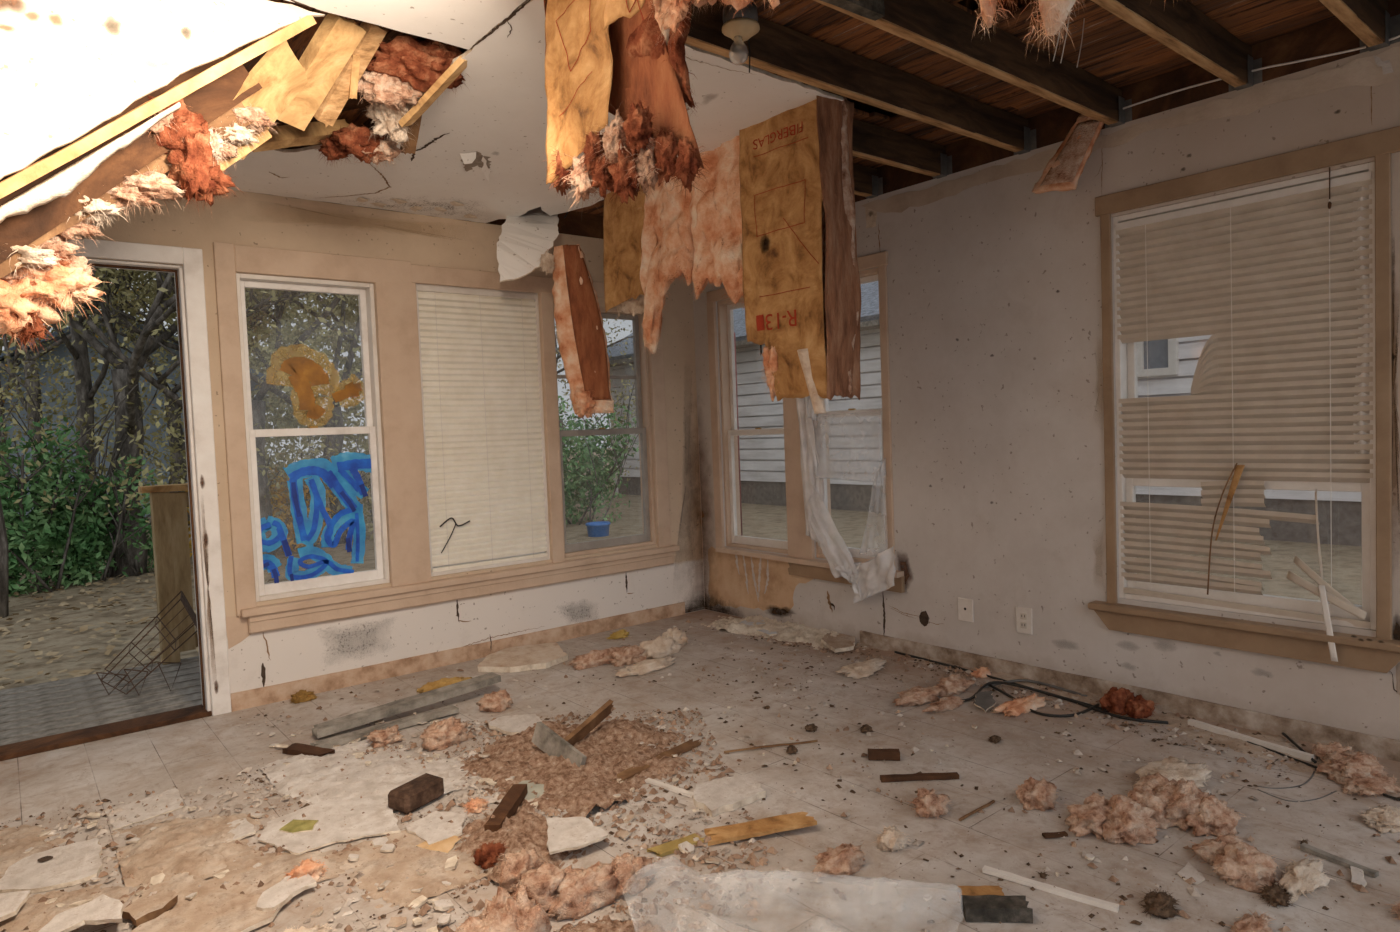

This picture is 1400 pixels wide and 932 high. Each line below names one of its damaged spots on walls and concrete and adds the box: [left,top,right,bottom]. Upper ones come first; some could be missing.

water stain [0,0,60,23]
water stain [106,20,118,33]